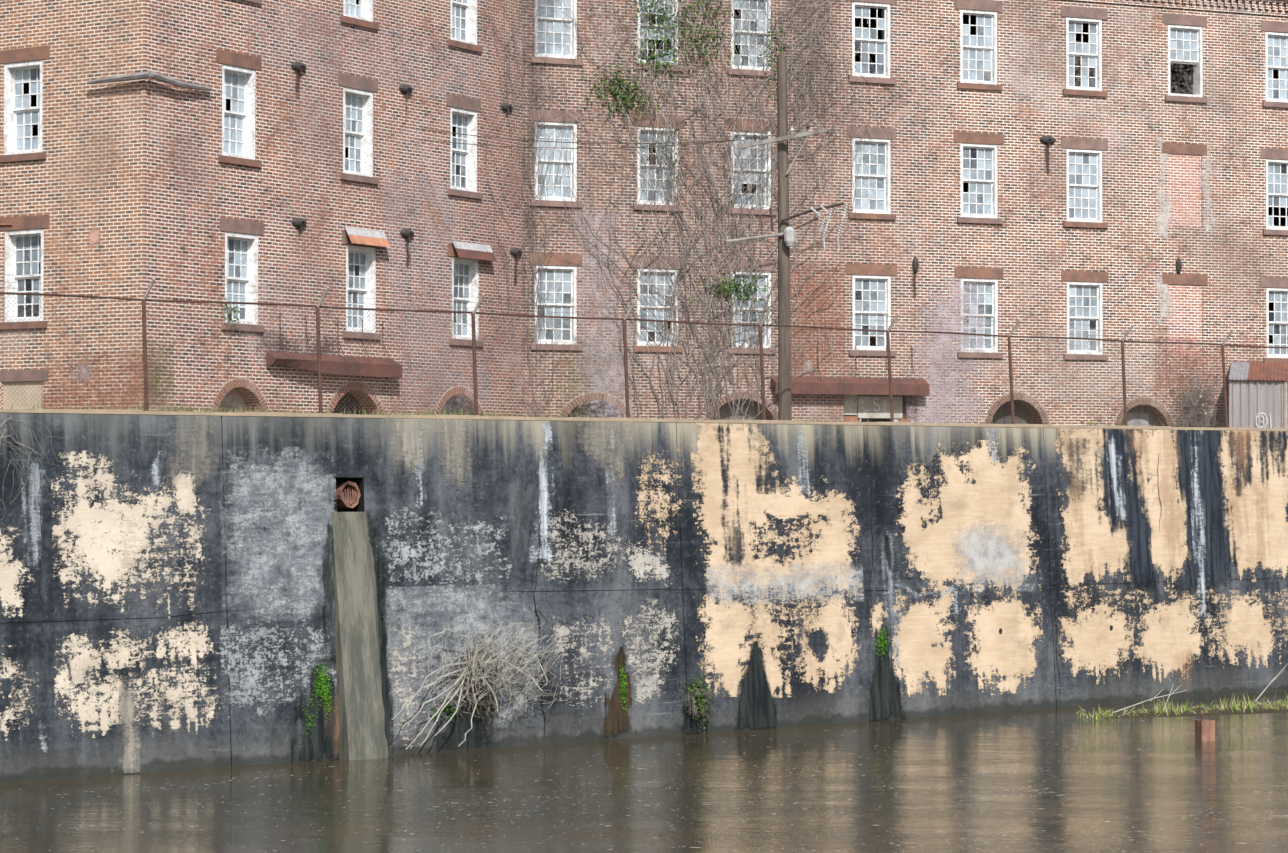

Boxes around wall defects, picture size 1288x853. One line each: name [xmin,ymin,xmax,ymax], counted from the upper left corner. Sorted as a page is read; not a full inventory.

peeling [0,450,337,741]
leakage [388,418,424,503]
peeling [375,503,536,748]
leakage [532,421,554,561]
peeling [534,423,1043,708]
leakage [909,454,976,528]
leakage [1067,429,1159,586]
peeling [1054,336,1288,684]
leakage [1173,430,1287,617]